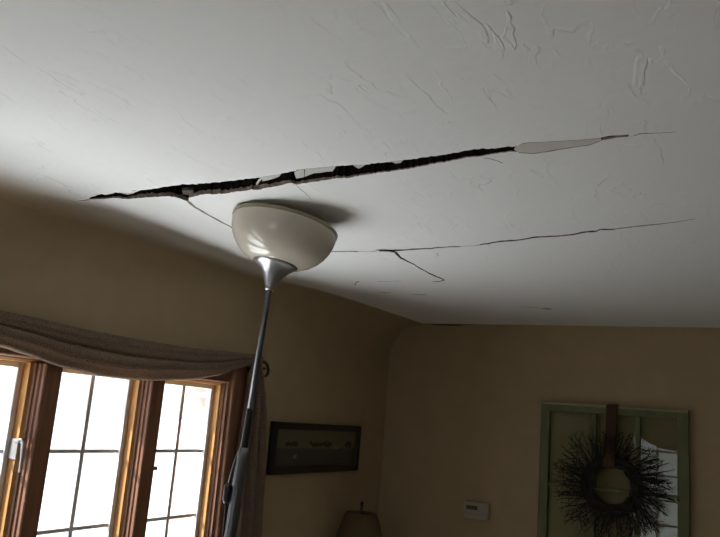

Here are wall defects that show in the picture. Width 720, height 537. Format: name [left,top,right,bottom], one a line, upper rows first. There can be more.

crack [78,132,672,228]
crack [331,219,693,282]